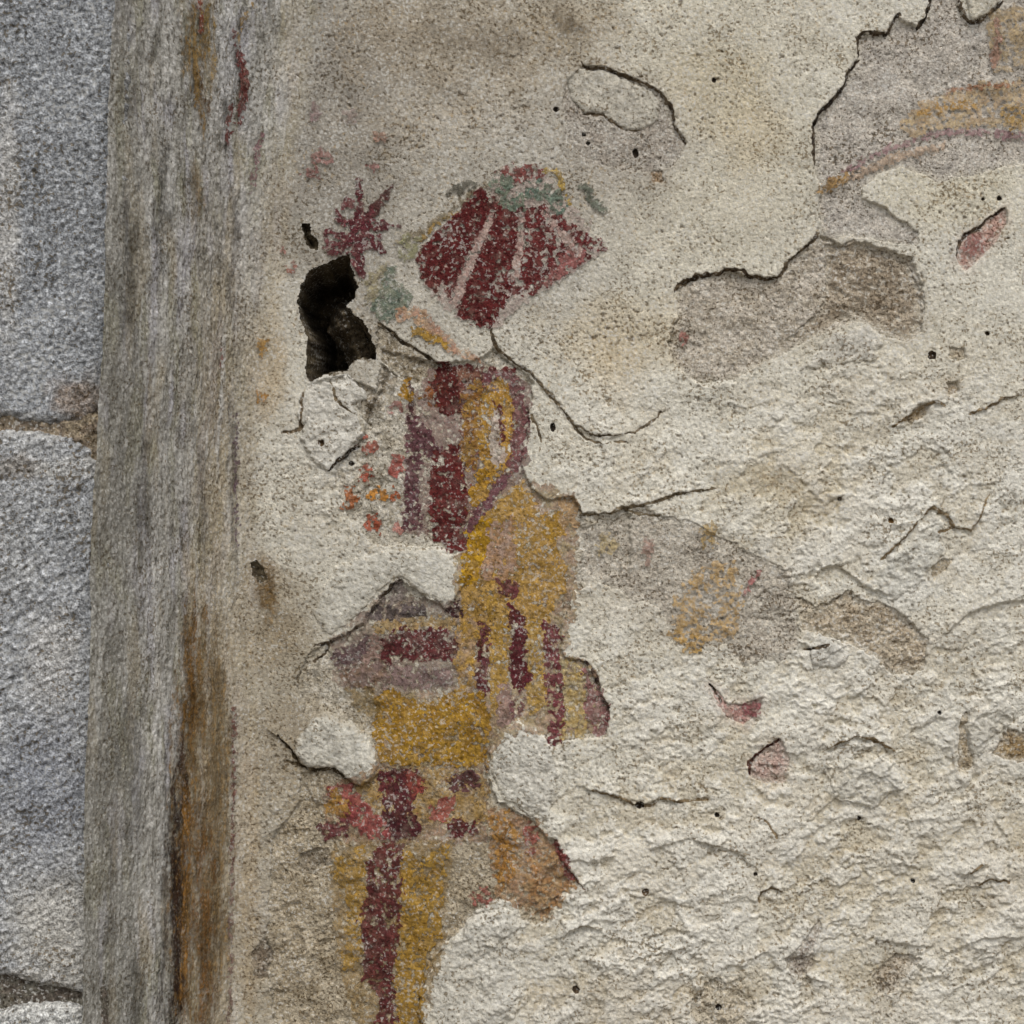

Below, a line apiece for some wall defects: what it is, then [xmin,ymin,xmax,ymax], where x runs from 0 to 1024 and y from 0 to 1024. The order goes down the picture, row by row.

crack [581,61,687,146]
crack [811,0,931,165]
crack [674,232,820,293]
flaking render [667,0,1024,384]
crack [490,316,662,444]
crack [578,486,717,518]
flaking render [251,303,929,1024]
rust [159,588,239,1024]